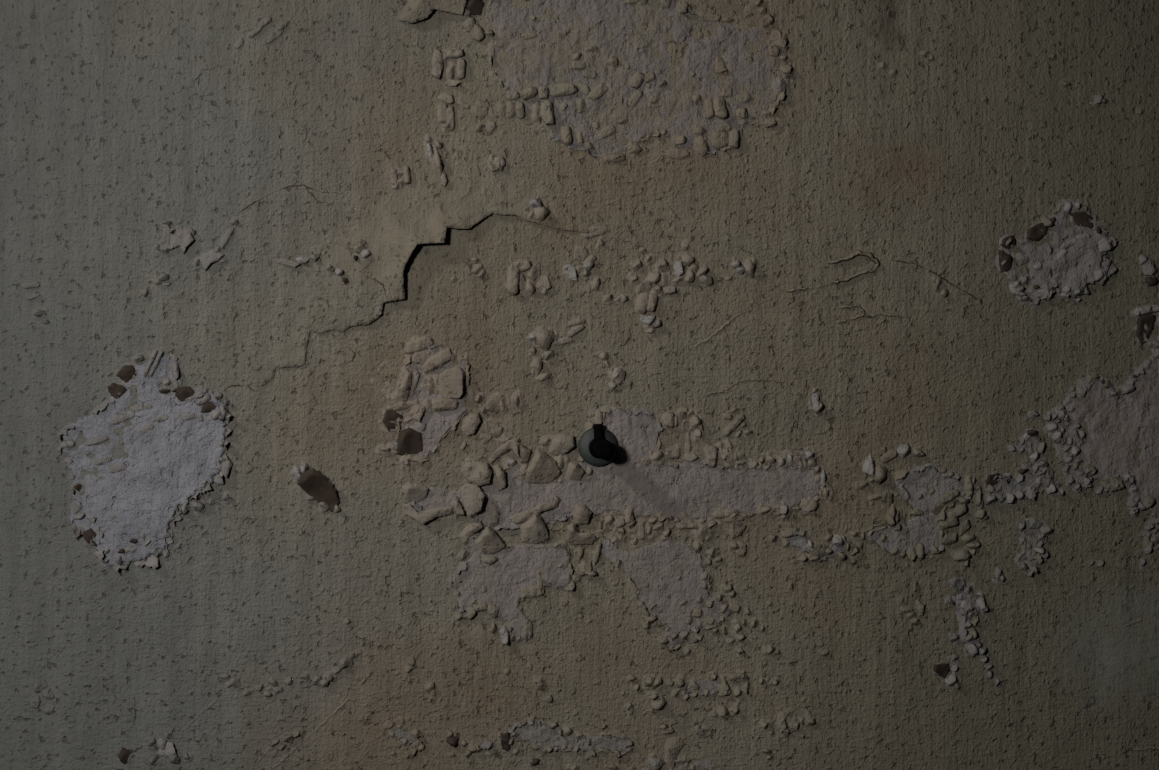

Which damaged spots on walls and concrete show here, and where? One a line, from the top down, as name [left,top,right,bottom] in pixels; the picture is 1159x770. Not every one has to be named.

peeling [398,0,795,165]
peeling [155,216,241,282]
peeling [995,198,1117,308]
peeling [56,349,236,573]
peeling [767,254,1159,692]
peeling [446,516,782,770]
peeling [759,707,815,761]